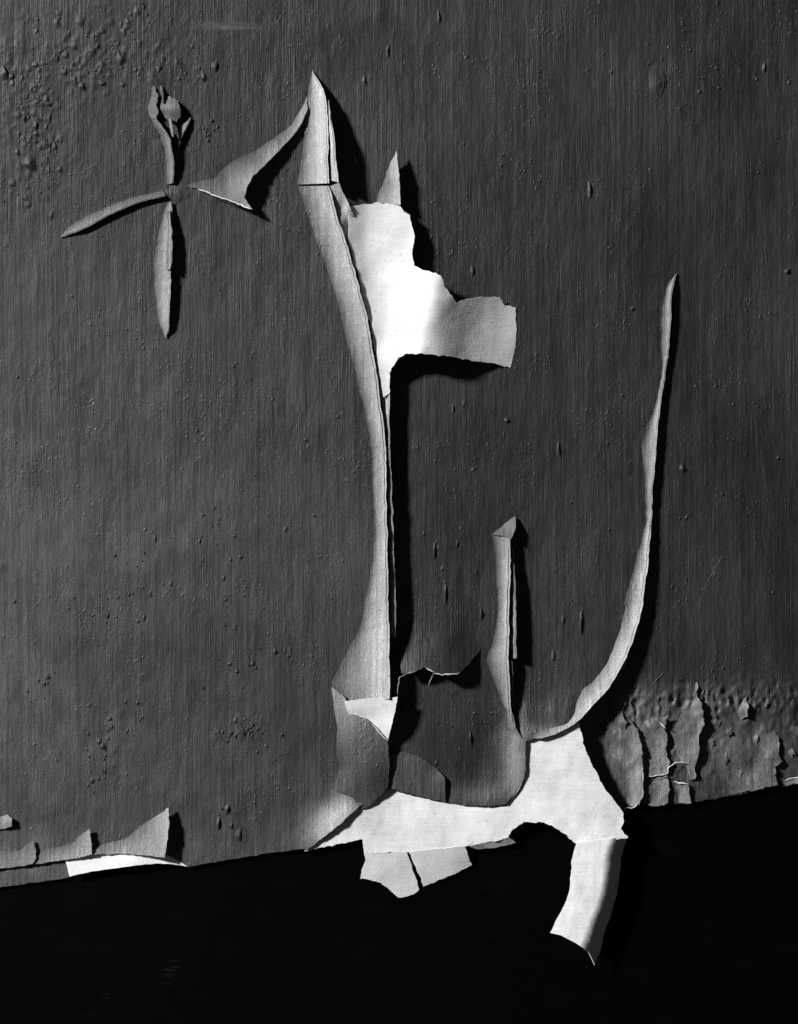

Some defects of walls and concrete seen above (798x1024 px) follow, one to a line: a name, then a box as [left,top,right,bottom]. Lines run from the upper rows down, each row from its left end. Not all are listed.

peeling [0,808,187,877]
peeling [61,71,677,965]